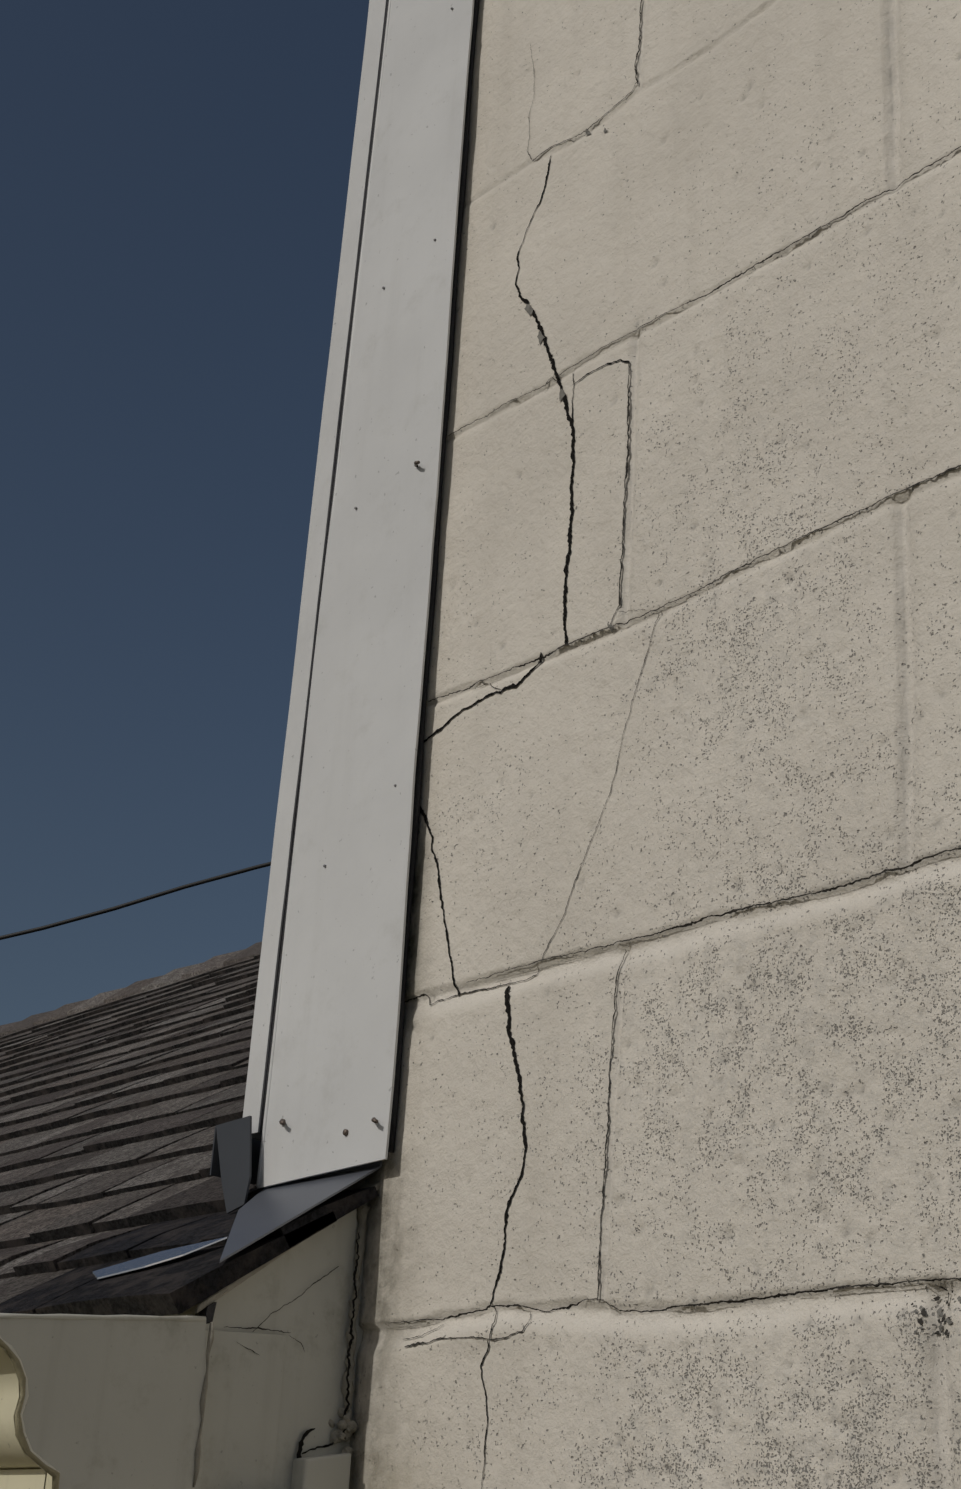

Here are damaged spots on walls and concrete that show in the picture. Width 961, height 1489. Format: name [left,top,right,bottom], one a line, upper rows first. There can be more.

crack [226,1233,360,1458]
crack [391,0,961,1489]